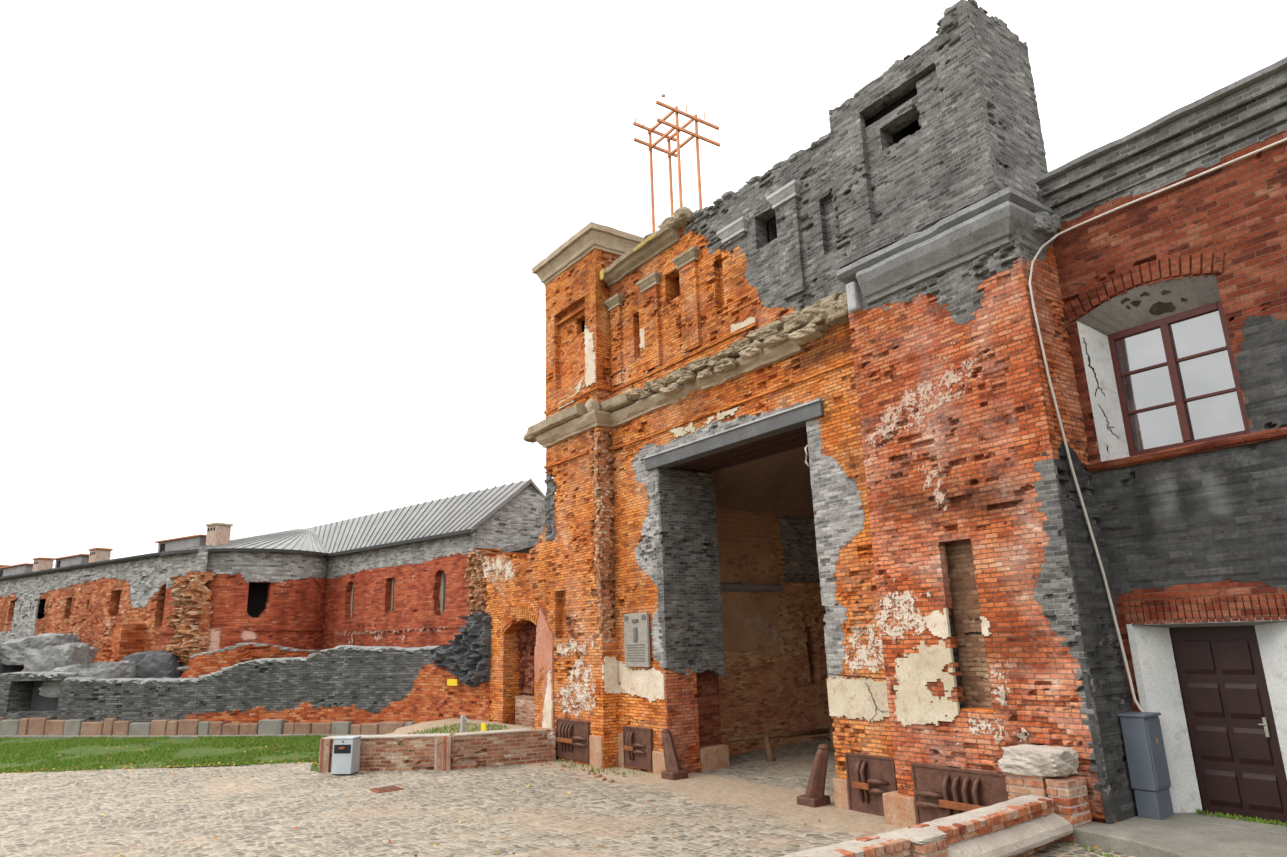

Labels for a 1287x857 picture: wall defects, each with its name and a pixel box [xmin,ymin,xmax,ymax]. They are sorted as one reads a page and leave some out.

spalling [644,133,831,240]
spalling [846,281,861,313]
crack [1082,337,1119,453]
spalling [161,573,217,662]
spalling [425,550,515,687]
spalling [542,429,665,729]
spalling [800,602,826,655]
peeling [826,578,1029,745]